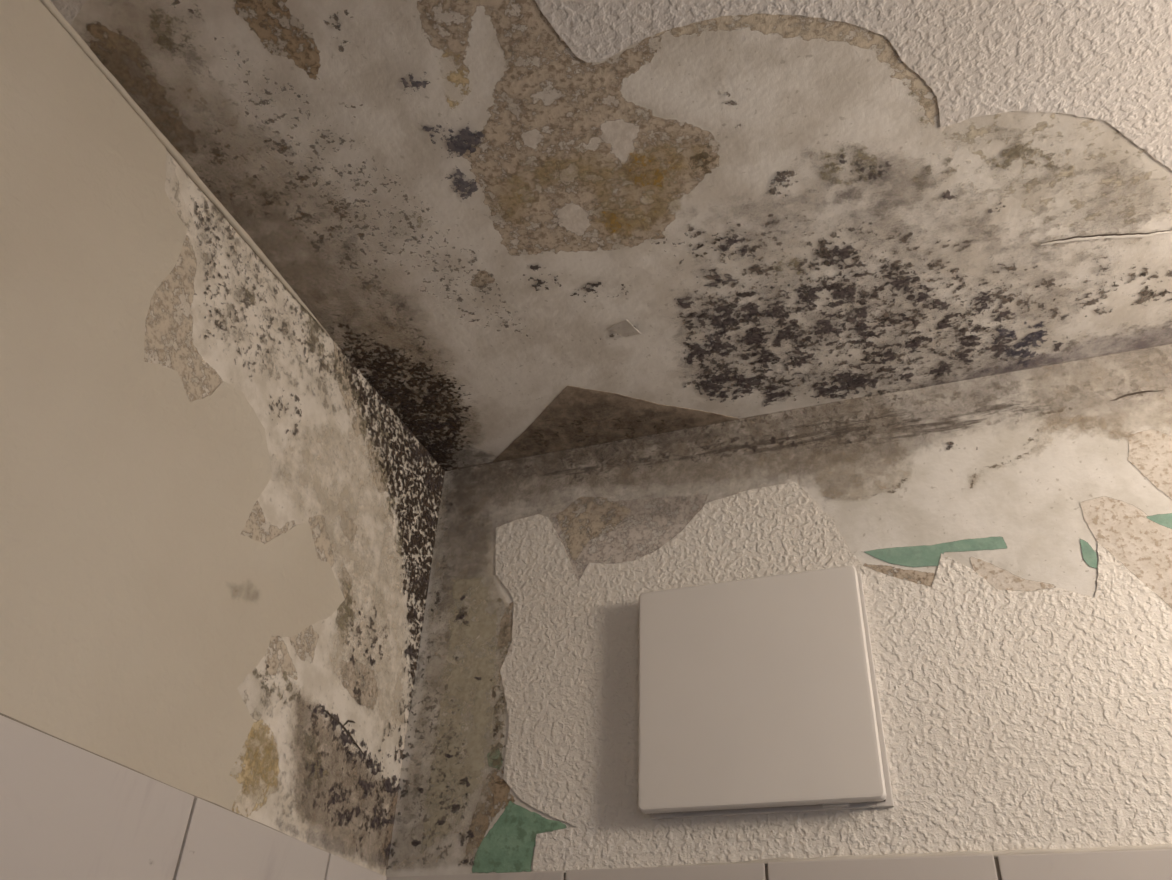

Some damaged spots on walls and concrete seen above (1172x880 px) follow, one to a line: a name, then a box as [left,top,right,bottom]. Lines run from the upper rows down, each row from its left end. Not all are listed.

water stain [150,0,198,52]
water stain [324,10,352,52]
water stain [1076,257,1172,317]
water stain [1102,327,1172,357]
water stain [154,51,1090,869]